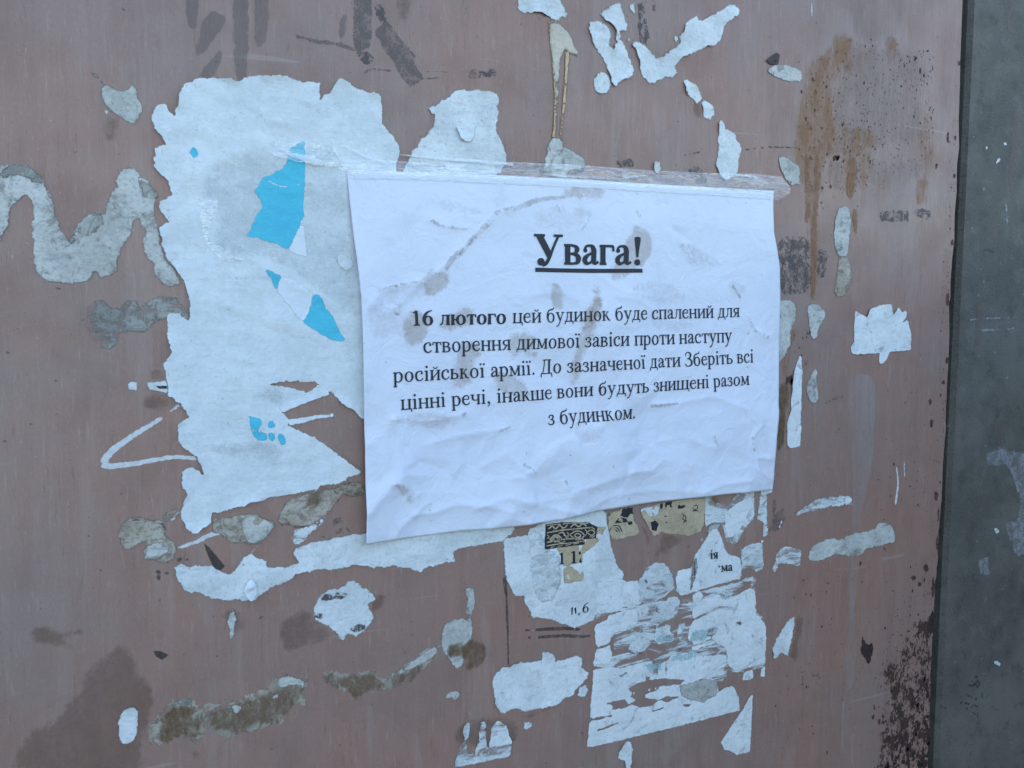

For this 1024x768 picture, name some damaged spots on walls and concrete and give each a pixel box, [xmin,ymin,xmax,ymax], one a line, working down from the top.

rust [797,39,863,299]
rust [859,561,935,768]